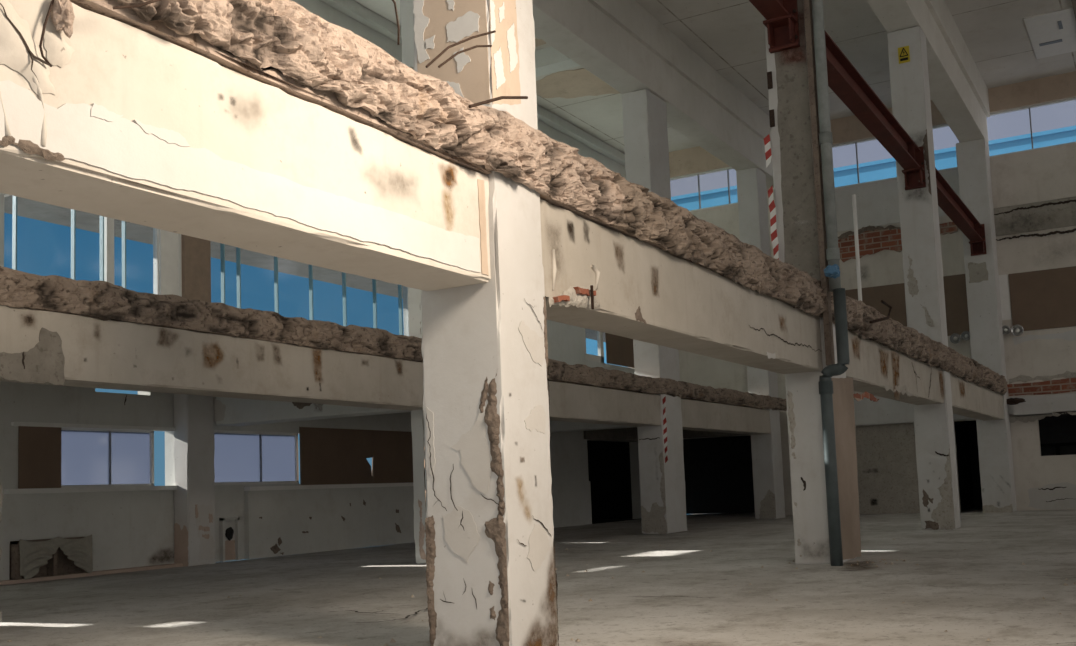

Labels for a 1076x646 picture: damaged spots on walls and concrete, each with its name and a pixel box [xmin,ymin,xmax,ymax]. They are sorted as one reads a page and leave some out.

spalling [0,0,1076,396]
crack [994,200,1076,241]
spalling [518,285,796,459]
crack [749,325,820,351]
peeling [174,523,188,567]
crack [426,413,499,529]
peeling [418,369,510,646]